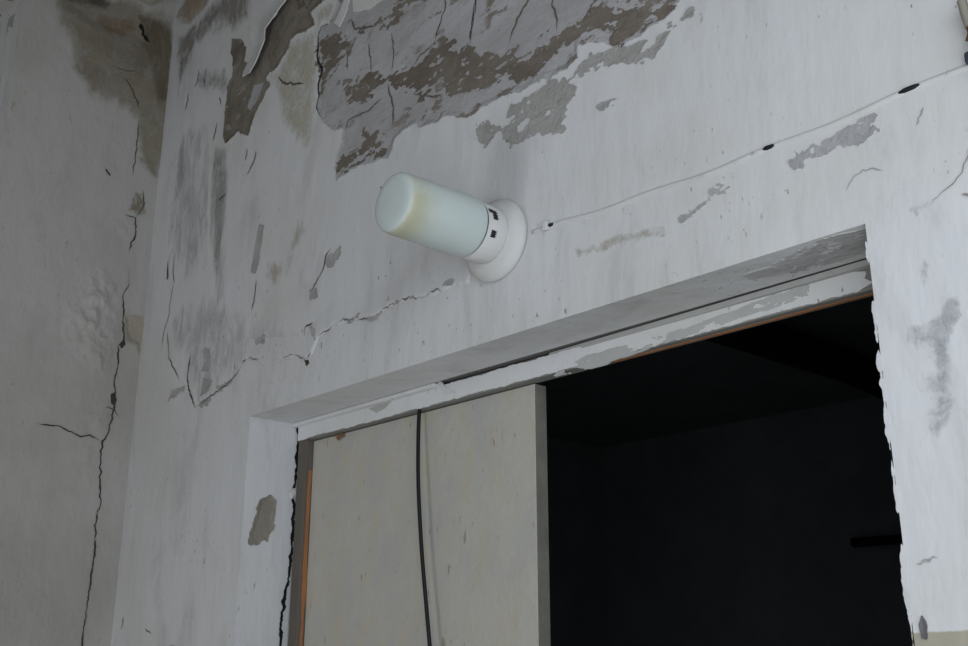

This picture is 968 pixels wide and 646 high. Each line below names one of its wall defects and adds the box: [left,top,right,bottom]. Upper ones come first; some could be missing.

crack [106,67,145,252]
peeling [223,0,695,181]
peeling [788,113,880,170]
crack [930,156,968,205]
crack [162,255,239,408]
crack [309,245,341,300]
peeling [554,285,810,377]
crack [41,285,129,646]
spalling [248,495,277,546]
crack [279,428,299,646]